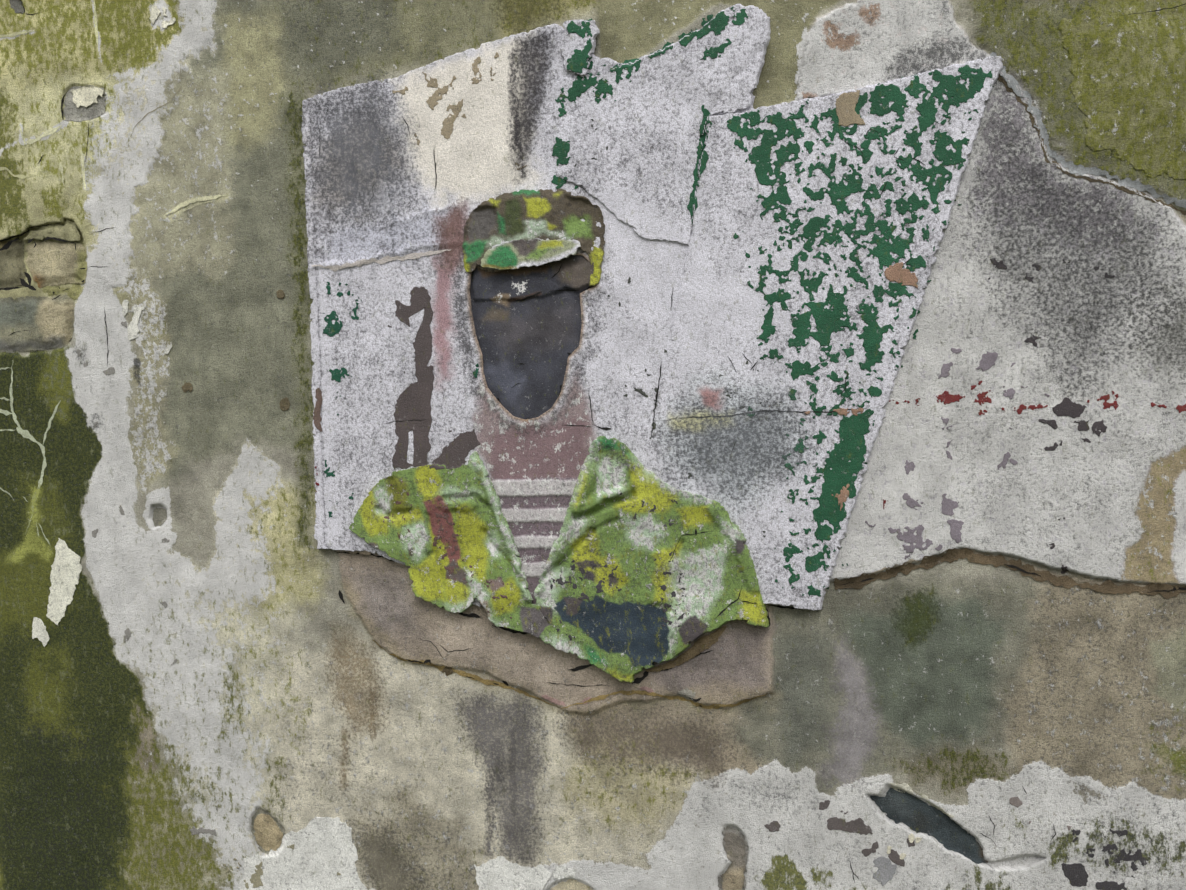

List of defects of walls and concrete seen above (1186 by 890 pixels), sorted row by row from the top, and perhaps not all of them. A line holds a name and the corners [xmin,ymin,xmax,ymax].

peeling [555,6,749,117]
peeling [551,137,578,189]
peeling [687,105,712,224]
crack [0,219,115,300]
peeling [727,65,1186,626]
crack [0,330,61,543]
damp [6,487,53,565]
peeling [32,538,82,647]
peeling [474,856,593,890]
spalling [718,826,749,890]
spalling [819,783,988,886]
peeling [1061,825,1151,890]